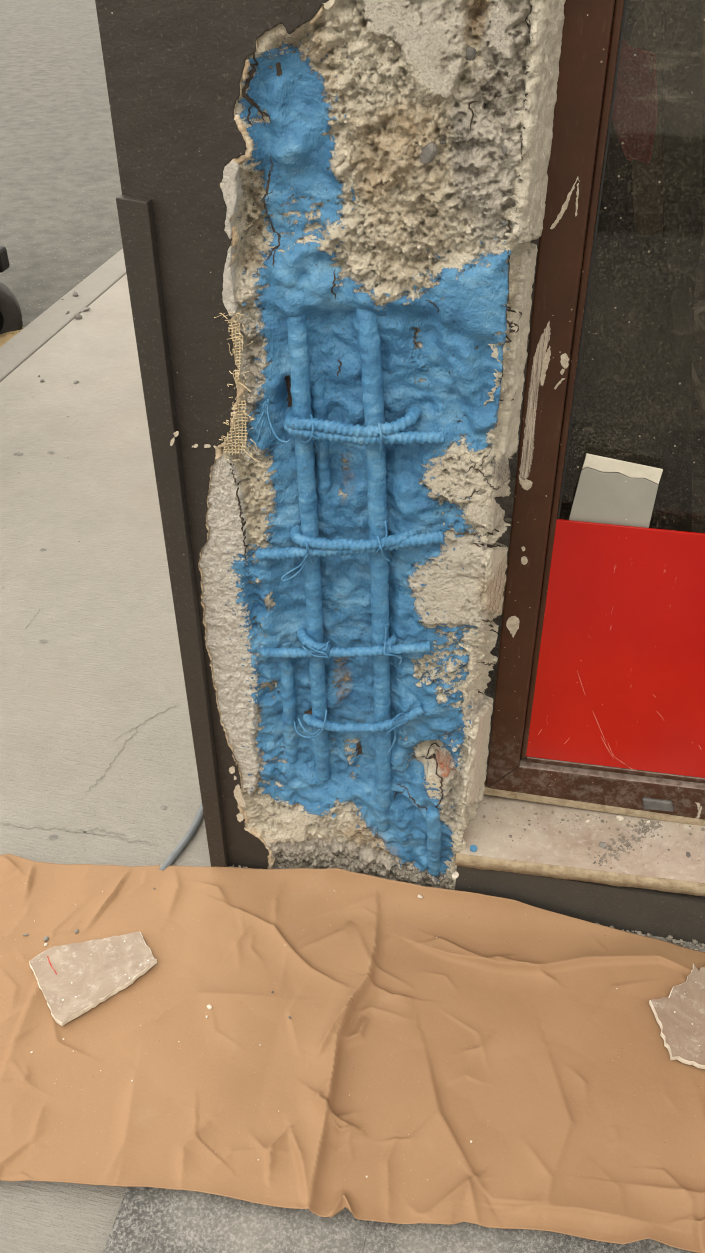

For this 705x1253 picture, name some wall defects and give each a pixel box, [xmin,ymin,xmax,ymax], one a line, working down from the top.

spalling [199,0,532,890]
crack [394,743,444,810]